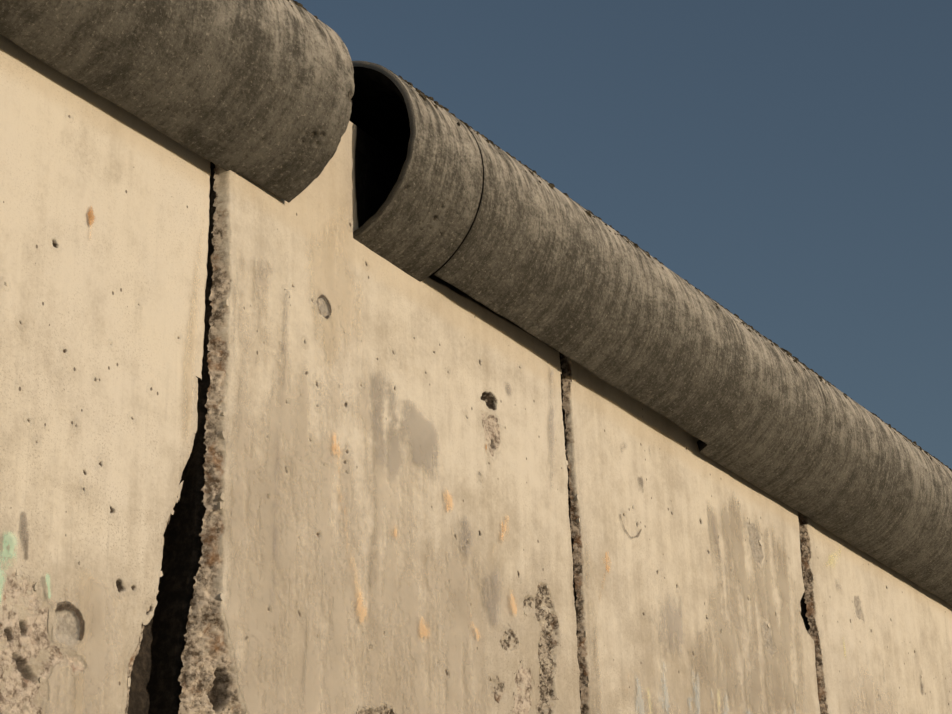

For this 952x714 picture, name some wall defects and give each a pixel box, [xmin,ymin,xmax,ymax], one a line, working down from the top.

spalling [557,351,595,714]
peeling [0,567,91,714]
spalling [357,700,399,714]
spalling [485,580,562,714]